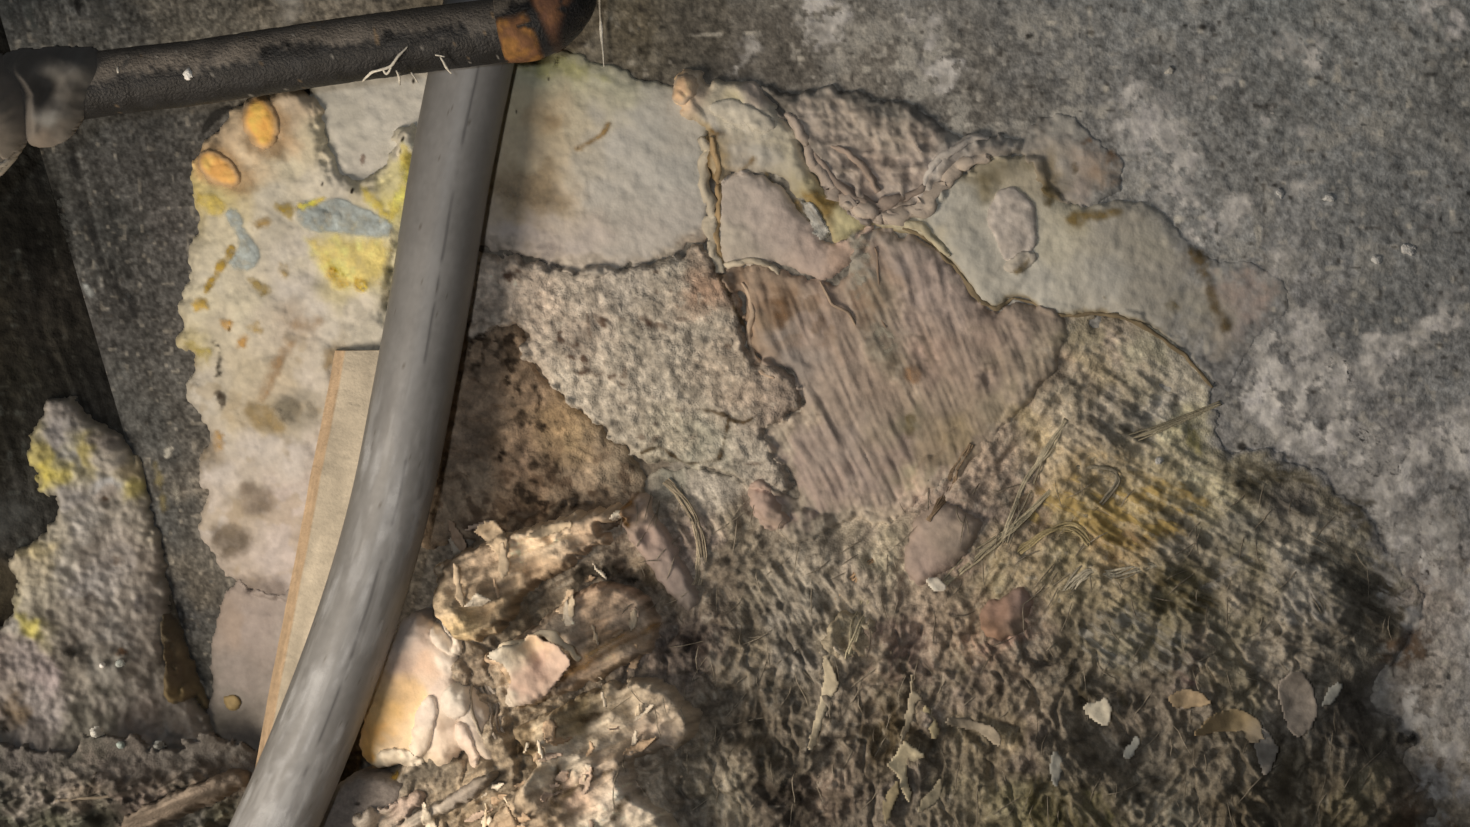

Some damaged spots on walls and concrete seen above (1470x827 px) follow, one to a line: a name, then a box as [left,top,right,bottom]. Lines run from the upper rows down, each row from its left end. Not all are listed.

rust [497,0,567,63]
peeling [759,84,1019,240]
leakage [194,246,234,311]
leakage [310,238,386,292]
leakage [466,322,546,432]
spalling [465,243,803,494]
leakage [1239,296,1470,672]
peeling [448,519,510,607]
peeling [487,630,582,707]
peeling [882,675,1001,824]
peeling [1083,698,1112,726]
leakage [1381,685,1470,800]